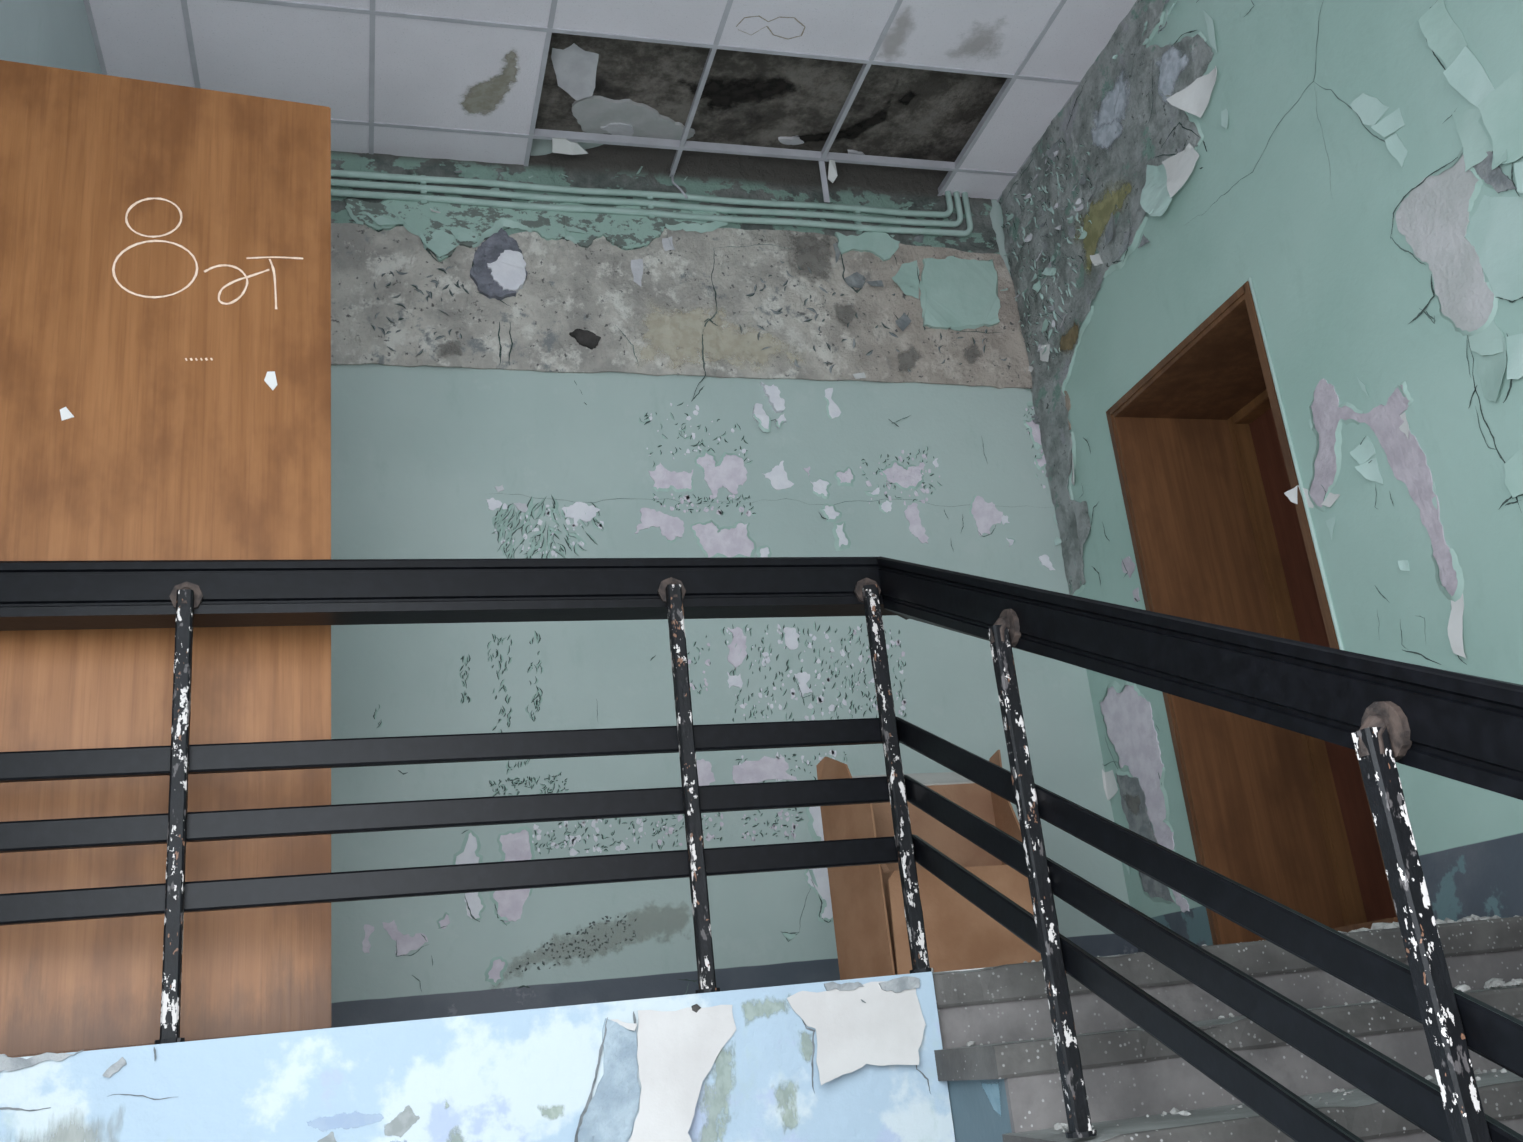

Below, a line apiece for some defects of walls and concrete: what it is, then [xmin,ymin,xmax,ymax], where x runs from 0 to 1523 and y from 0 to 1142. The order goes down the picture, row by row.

water stain [461,51,517,114]
peeling [1390,0,1523,403]
spalling [331,0,1229,602]
crack [1468,320,1523,513]
peeling [1284,375,1467,665]
peeling [687,621,907,722]
peeling [696,750,847,786]
peeling [1099,680,1177,853]
peeling [453,814,684,865]
peeling [362,888,533,966]
peeling [574,1005,736,1142]
peeling [787,976,931,1094]